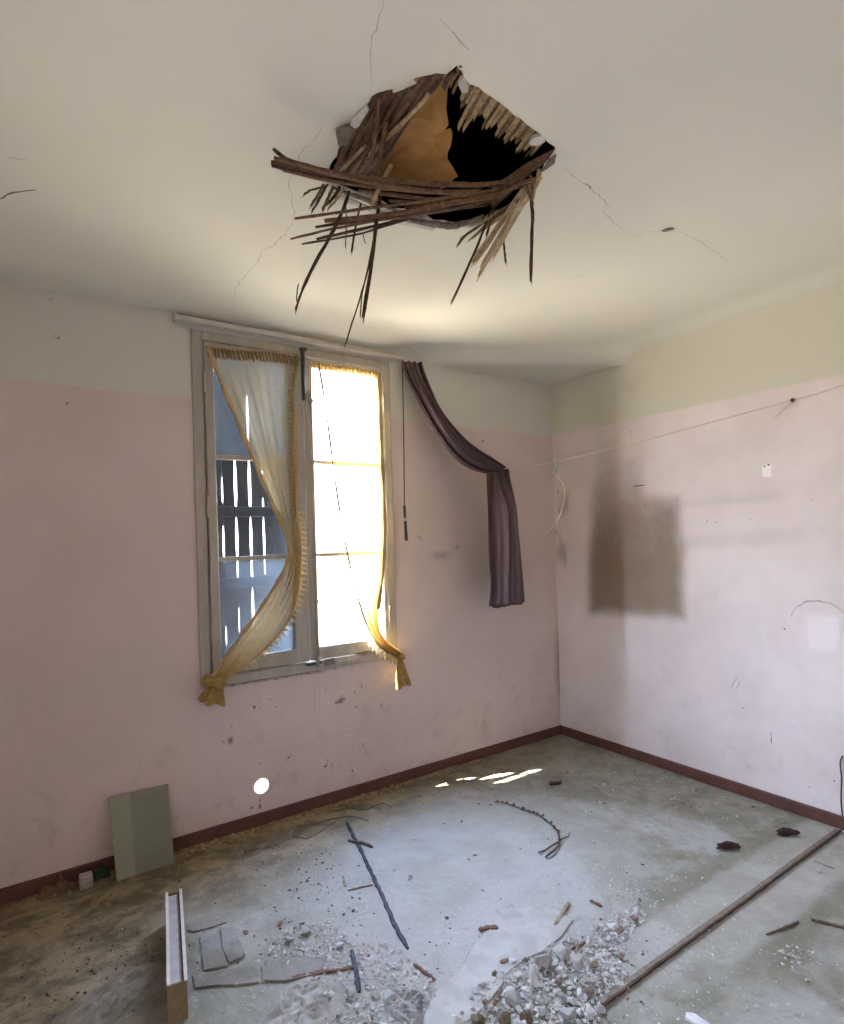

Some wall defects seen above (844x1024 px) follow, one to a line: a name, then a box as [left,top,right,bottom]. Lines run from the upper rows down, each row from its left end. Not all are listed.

peeling [458,75,468,93]
peeling [336,104,369,145]
peeling [529,133,545,146]
crack [233,130,321,301]
peeling [333,192,383,214]
peeling [398,221,435,231]
crack [565,167,728,262]
water stain [593,509,679,613]